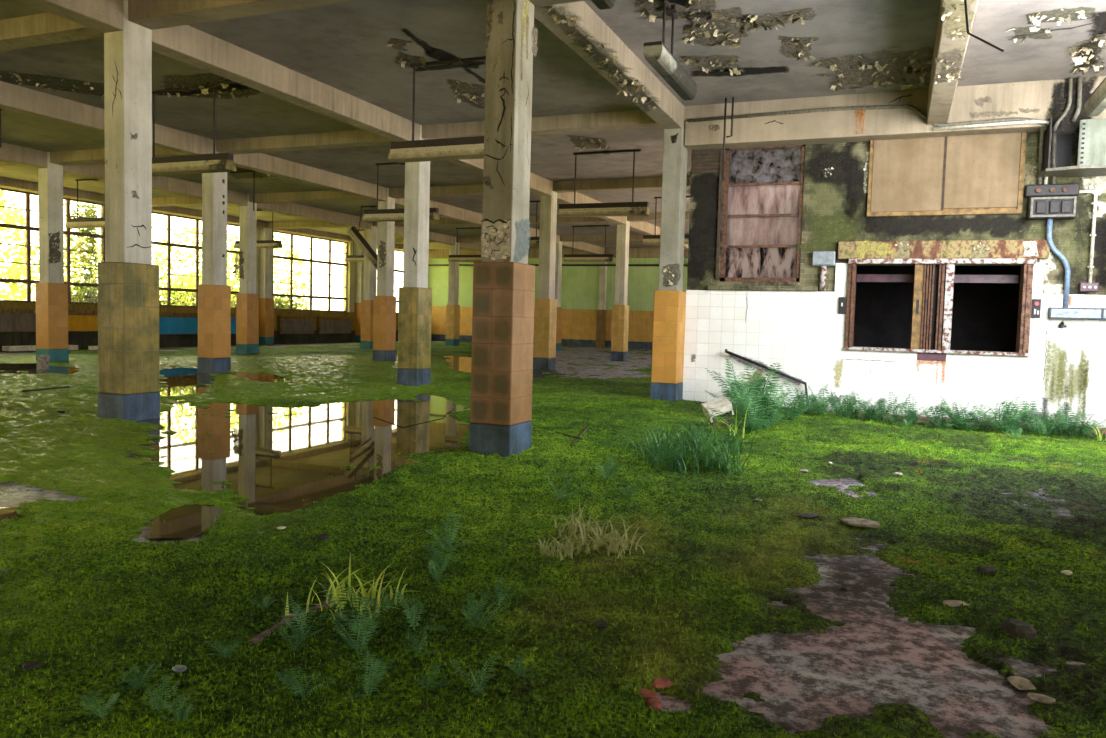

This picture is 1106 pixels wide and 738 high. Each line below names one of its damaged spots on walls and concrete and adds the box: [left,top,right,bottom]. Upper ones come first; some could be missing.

peeling [0,70,104,97]
crack [112,64,122,117]
peeling [161,73,264,101]
crack [483,0,529,186]
peeling [545,6,658,113]
peeling [635,0,975,93]
peeling [1008,7,1095,44]
peeling [1067,35,1106,77]
water stain [802,142,1026,238]
peeling [1083,176,1106,219]
peeling [481,220,511,262]
water stain [1017,350,1088,423]